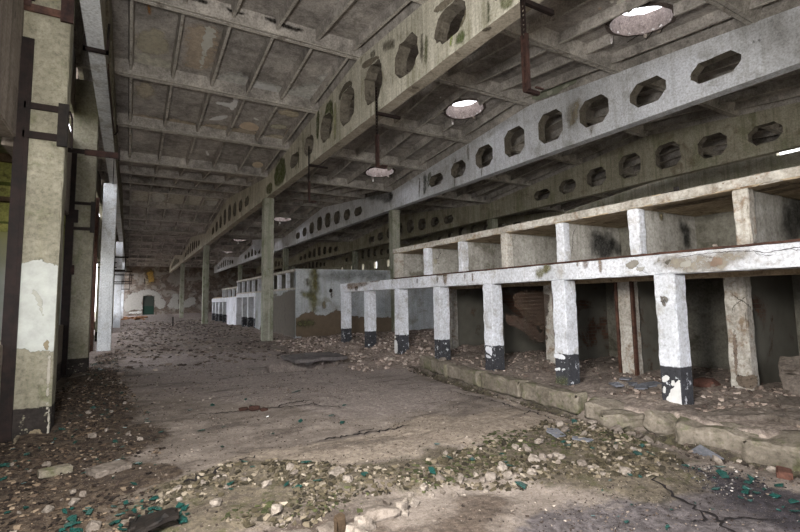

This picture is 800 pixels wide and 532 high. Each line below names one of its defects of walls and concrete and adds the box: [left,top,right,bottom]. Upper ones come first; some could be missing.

flaking render [626,260,650,274]
flaking render [658,251,746,272]
peeling [13,259,58,444]
peeling [662,375,682,405]
crack [646,473,776,532]